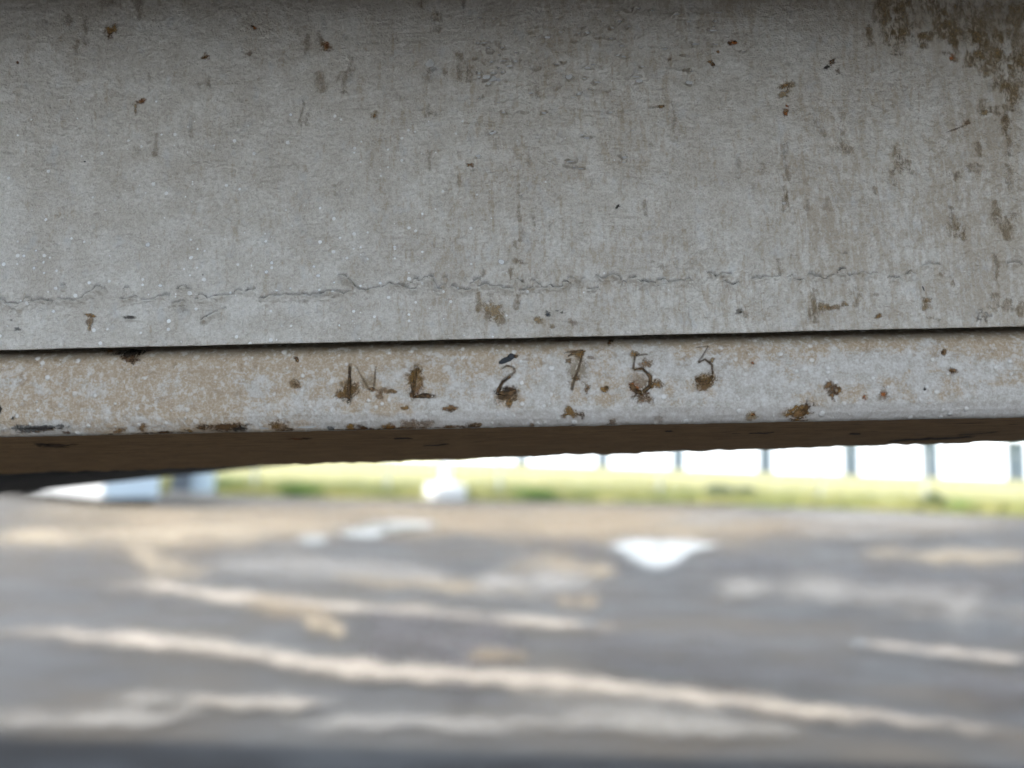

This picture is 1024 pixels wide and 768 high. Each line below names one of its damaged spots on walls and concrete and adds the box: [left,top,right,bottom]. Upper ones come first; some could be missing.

damp [866,0,1024,111]
crack [805,252,919,287]
crack [0,272,744,328]
corrosion [824,381,842,400]
corrosion [783,403,815,421]